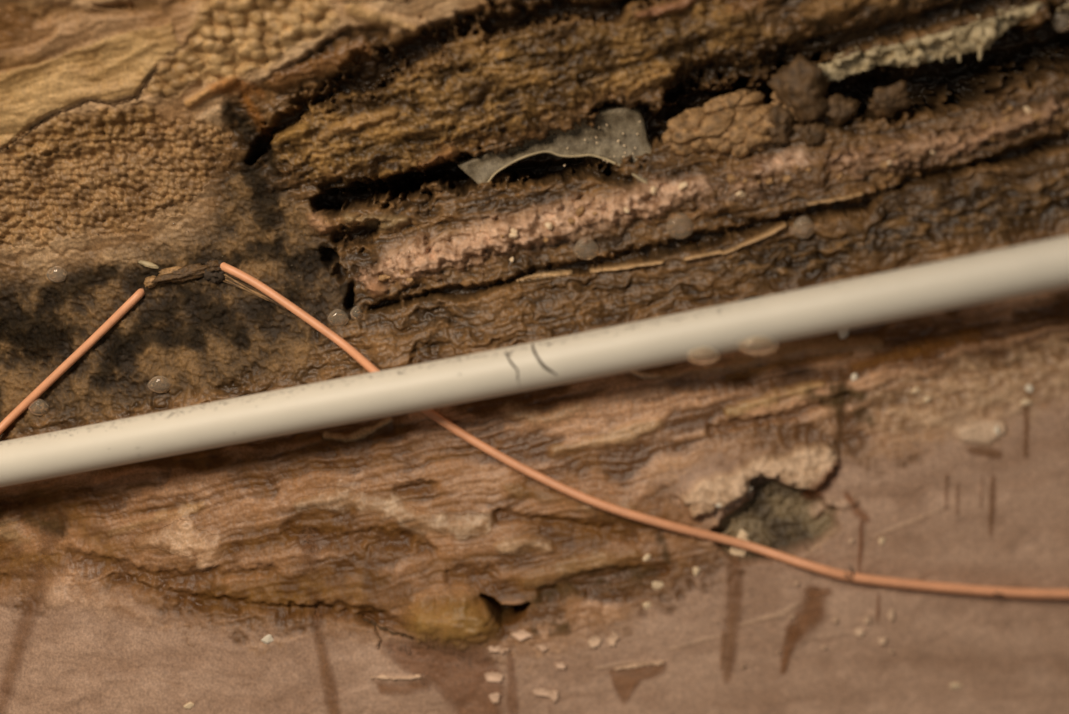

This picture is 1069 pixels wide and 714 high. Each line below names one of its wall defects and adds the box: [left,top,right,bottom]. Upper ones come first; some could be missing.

crack [0,68,159,152]
peeling [0,23,180,147]
flaking render [223,0,1069,291]
water stain [191,102,337,320]
water stain [0,266,118,358]
water stain [131,265,175,289]
water stain [93,285,250,386]
water stain [339,284,355,317]
water stain [803,374,864,497]
flaking render [678,442,838,563]
water stain [378,642,517,714]
water stain [781,588,830,673]